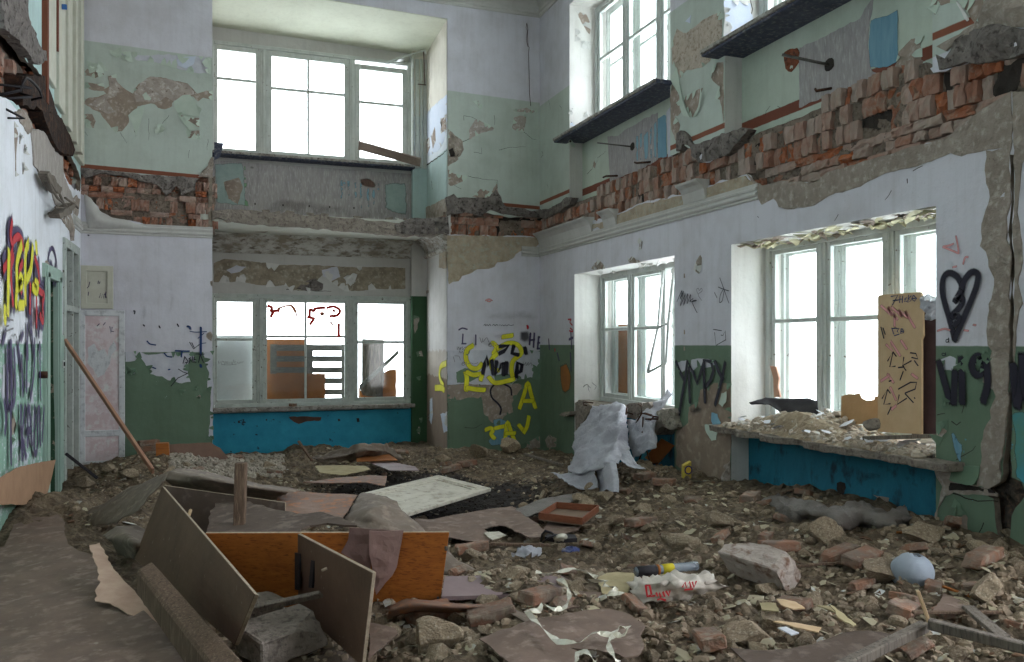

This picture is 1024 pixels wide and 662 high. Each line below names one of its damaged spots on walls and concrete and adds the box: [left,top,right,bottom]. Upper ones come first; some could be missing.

flaking render [0,0,47,97]
flaking render [14,0,1024,517]